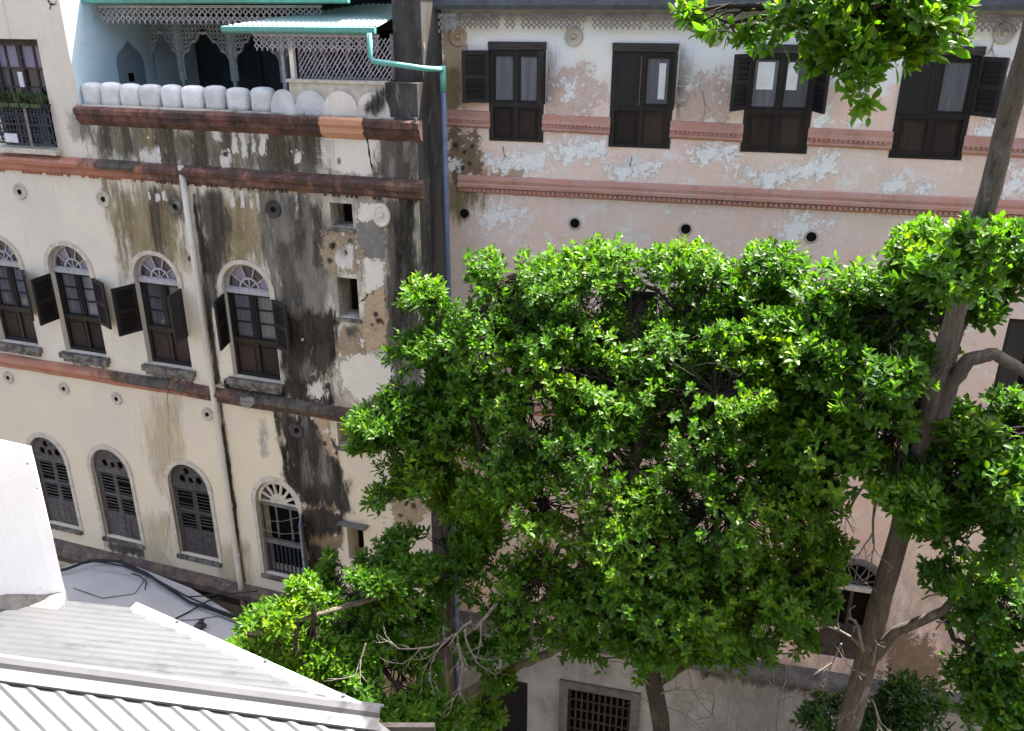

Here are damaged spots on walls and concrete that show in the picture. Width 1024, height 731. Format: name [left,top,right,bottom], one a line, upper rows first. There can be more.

peeling [546,60,607,117]
leakage [70,104,321,173]
spalling [447,127,663,185]
peeling [683,141,846,190]
spalling [318,227,365,278]
spalling [335,286,390,358]
leakage [363,198,426,408]
leakage [148,186,354,583]
leakage [74,363,193,479]
leakage [383,476,429,530]